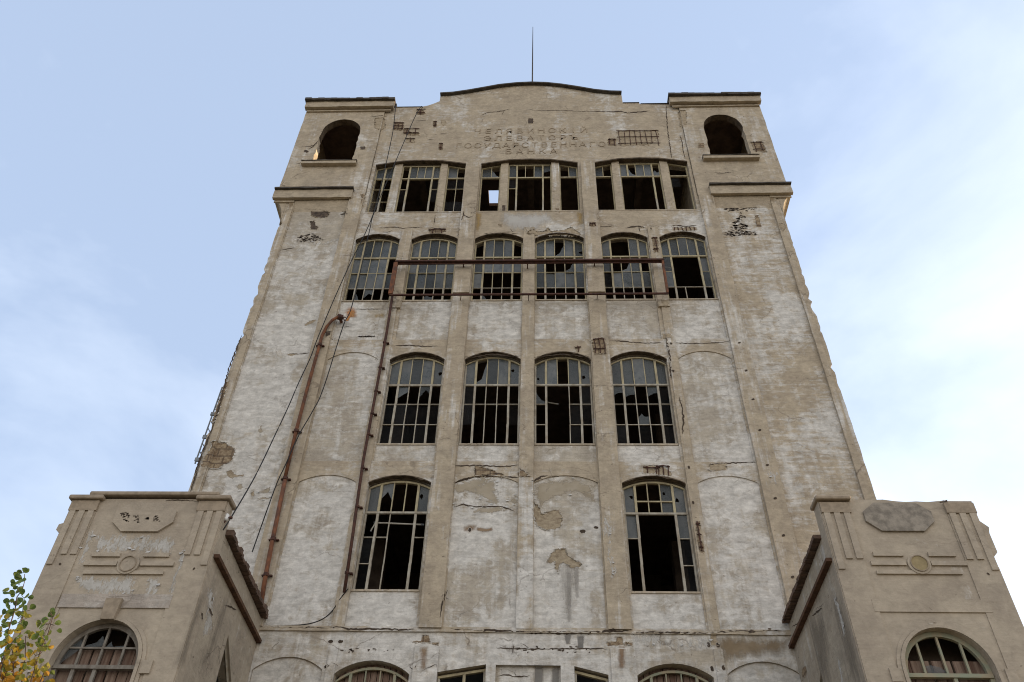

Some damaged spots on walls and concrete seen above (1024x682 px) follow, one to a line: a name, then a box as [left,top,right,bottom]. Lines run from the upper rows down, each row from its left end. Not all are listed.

spalling [297,209,348,245]
spalling [724,208,761,237]
spalling [200,440,271,500]
peeling [453,466,517,514]
peeling [517,470,594,531]
spalling [546,548,582,573]